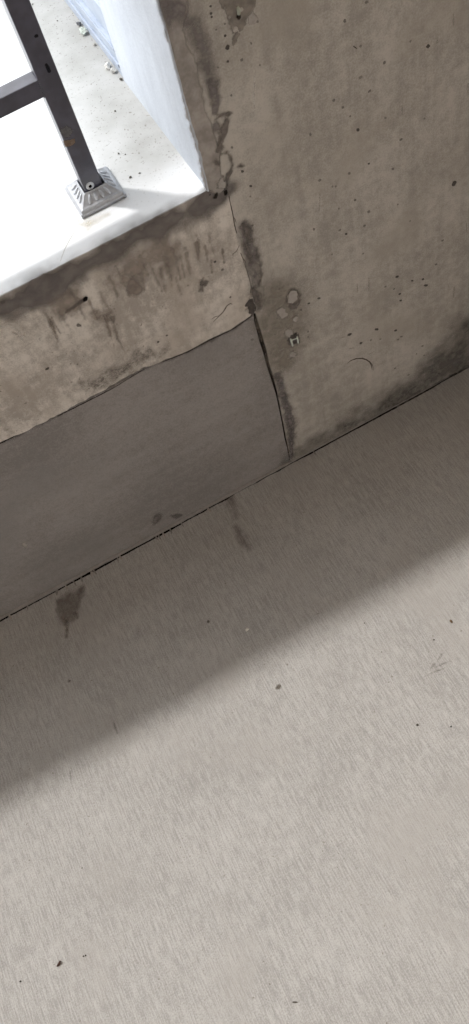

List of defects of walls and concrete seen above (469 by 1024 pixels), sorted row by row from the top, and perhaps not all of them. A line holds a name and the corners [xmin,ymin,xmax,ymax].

crack [0,196,457,622]
leakage [239,221,301,458]